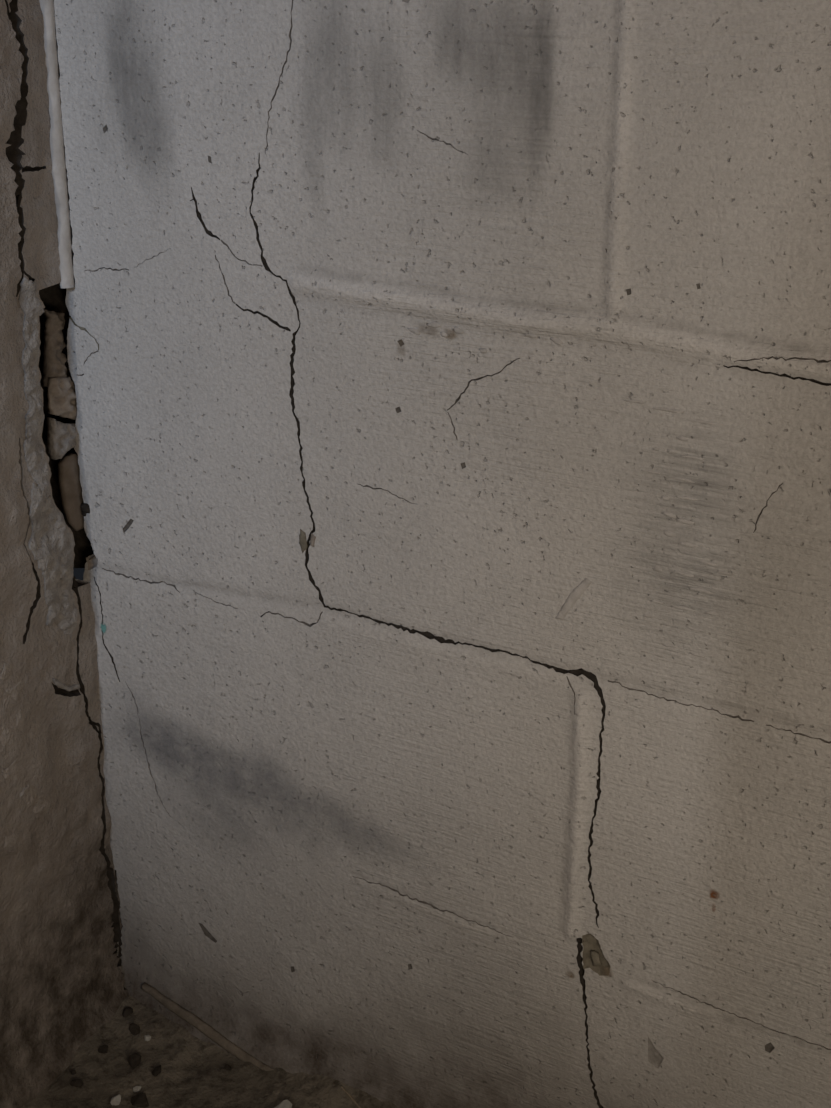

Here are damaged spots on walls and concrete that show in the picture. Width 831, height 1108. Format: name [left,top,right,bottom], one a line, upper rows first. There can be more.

crack [5,0,46,297]
flaking render [18,277,98,639]
crack [190,0,831,1108]